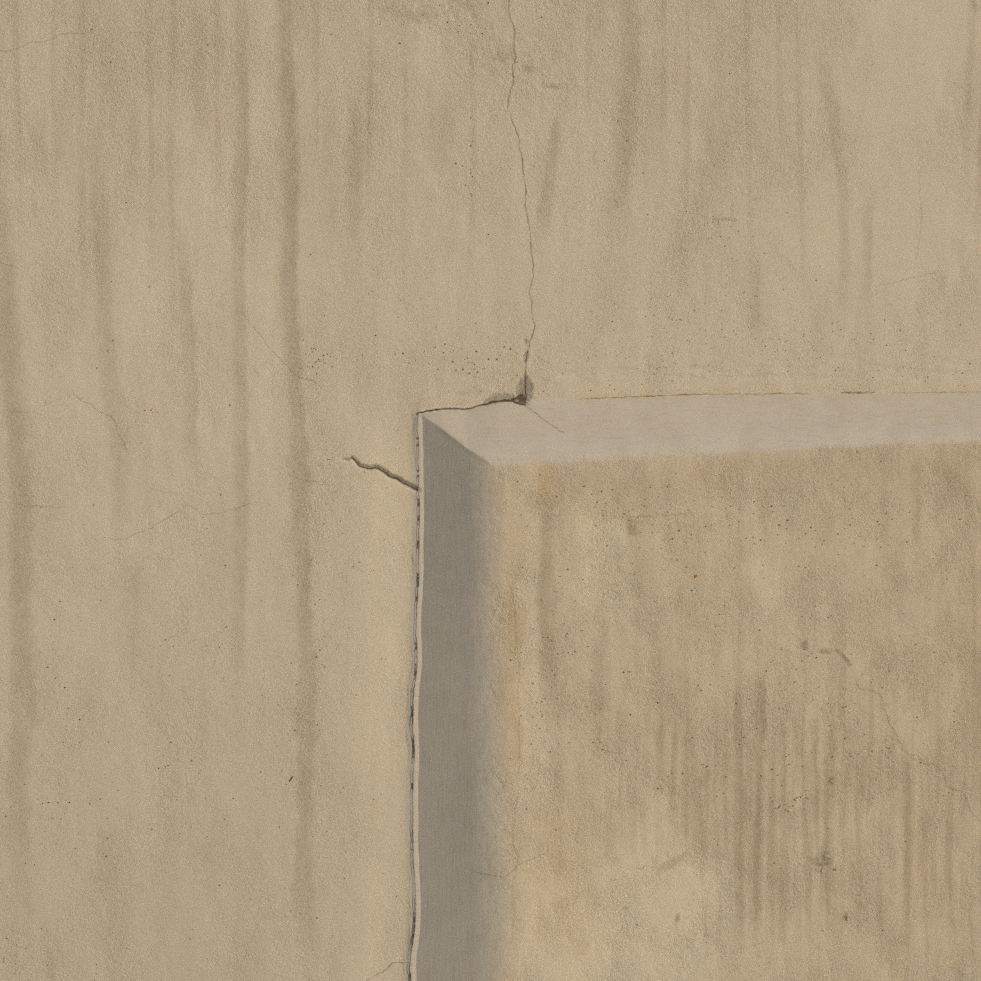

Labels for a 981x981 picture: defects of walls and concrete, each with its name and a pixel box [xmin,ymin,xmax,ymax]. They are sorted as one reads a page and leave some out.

crack [327,0,536,979]